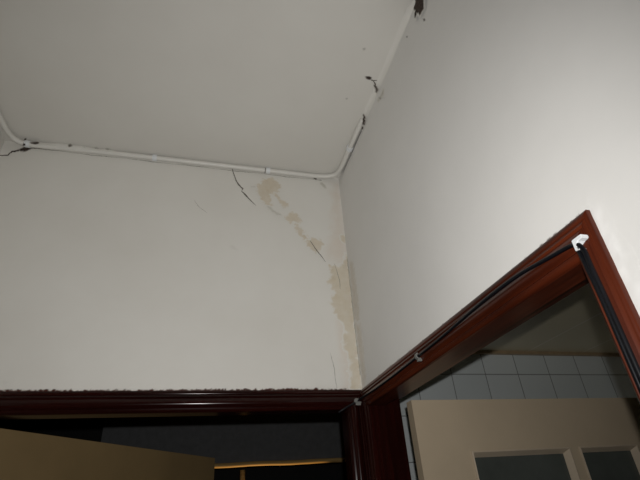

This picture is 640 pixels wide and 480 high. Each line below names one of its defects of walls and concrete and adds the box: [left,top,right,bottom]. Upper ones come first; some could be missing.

flaking render [413,0,426,21]
crack [0,138,40,156]
water stain [317,178,368,390]